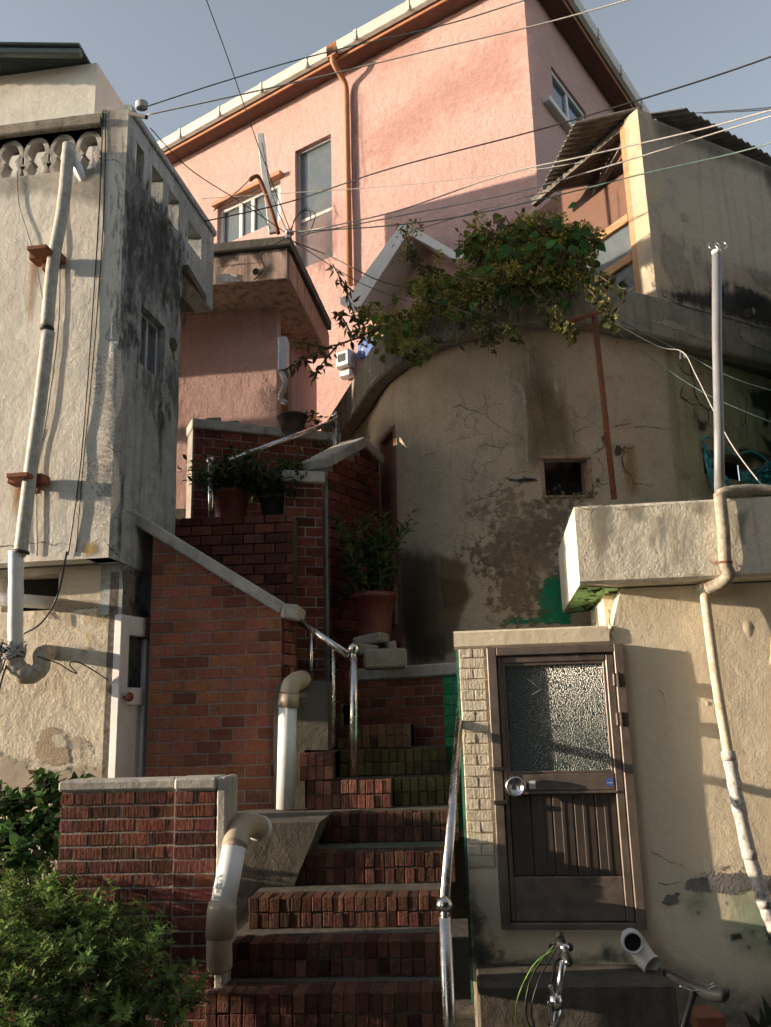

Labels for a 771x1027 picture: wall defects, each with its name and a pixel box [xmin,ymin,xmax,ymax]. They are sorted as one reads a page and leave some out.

damp [661,235,771,352]
crack [678,361,713,428]
crack [399,390,693,626]
peeling [0,726,101,802]
peeling [662,865,752,906]